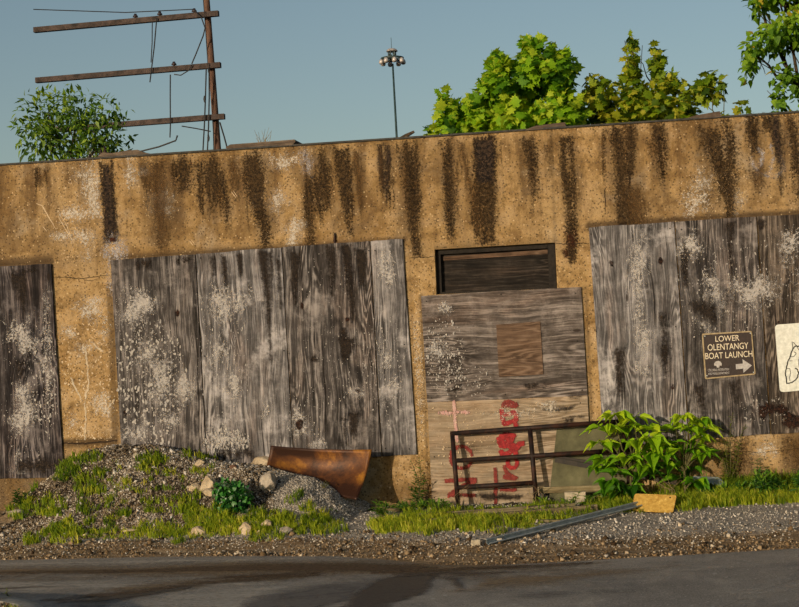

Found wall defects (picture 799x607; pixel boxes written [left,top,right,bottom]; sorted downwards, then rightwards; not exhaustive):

water stain [98,160,119,244]
water stain [140,149,301,363]
water stain [298,145,363,245]
water stain [326,245,367,360]
water stain [377,140,423,257]
water stain [438,134,502,244]
water stain [520,136,579,264]
water stain [598,124,647,225]
water stain [649,122,670,184]
water stain [679,247,688,287]
water stain [691,289,730,324]
water stain [697,112,799,282]